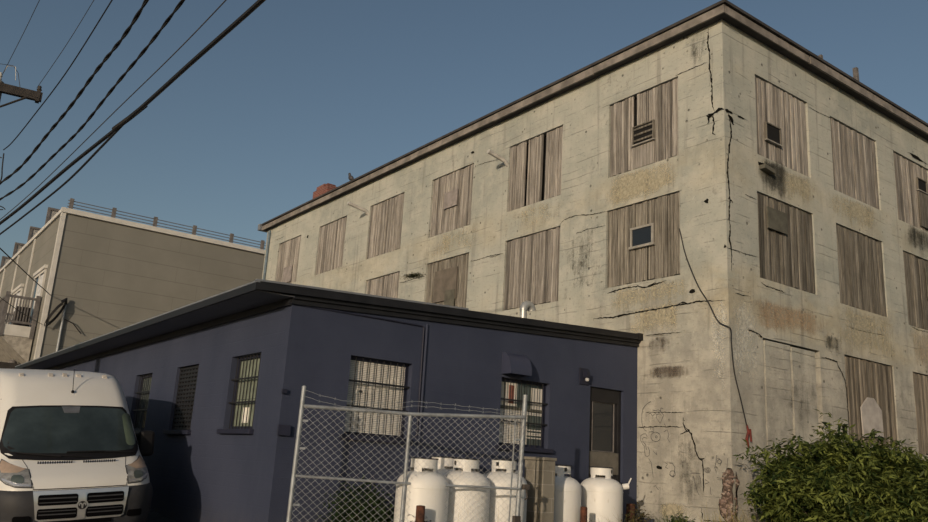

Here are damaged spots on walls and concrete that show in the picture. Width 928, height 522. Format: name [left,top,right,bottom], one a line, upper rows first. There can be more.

crack [678,28,754,270]
crack [609,280,667,293]
crack [594,282,784,319]
crack [638,412,725,522]
spalling [718,468,740,522]